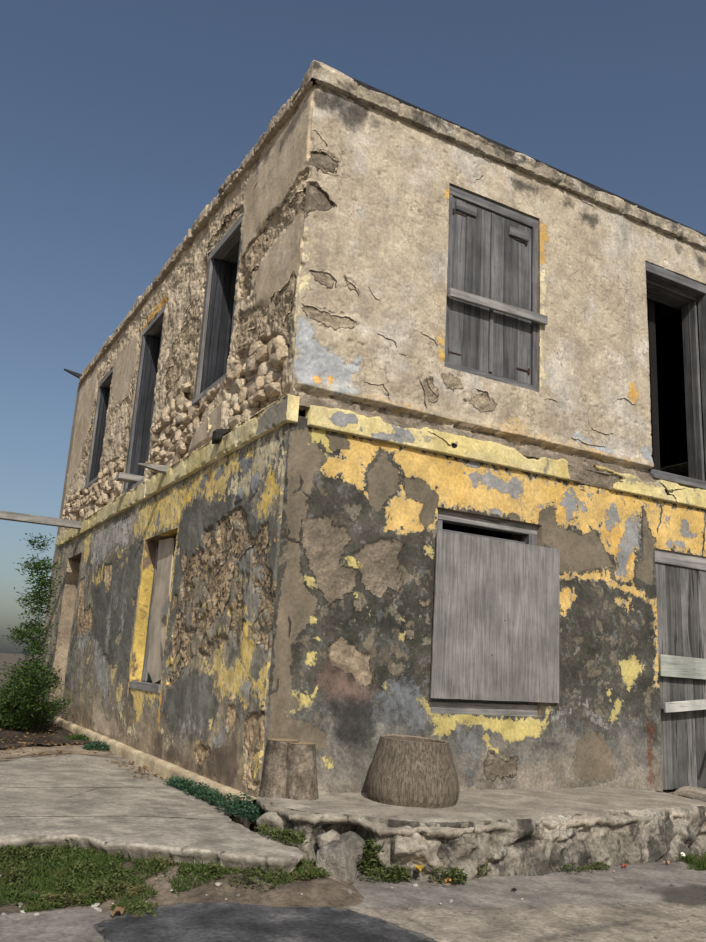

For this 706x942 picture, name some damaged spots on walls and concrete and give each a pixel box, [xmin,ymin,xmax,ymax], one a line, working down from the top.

crack [181,294,200,331]
peeling [77,148,706,793]